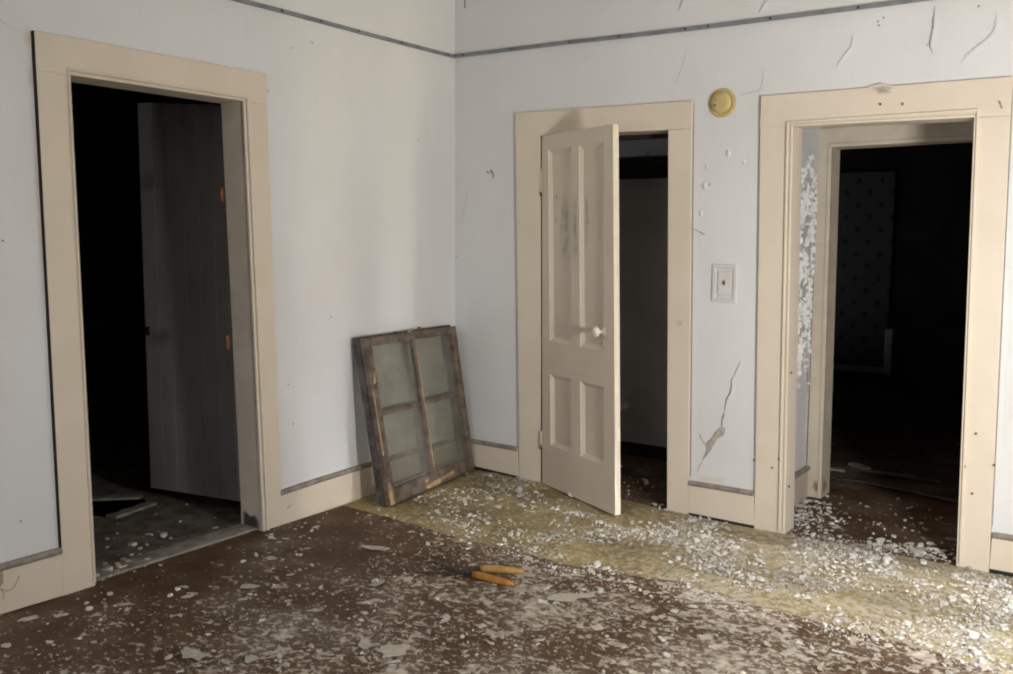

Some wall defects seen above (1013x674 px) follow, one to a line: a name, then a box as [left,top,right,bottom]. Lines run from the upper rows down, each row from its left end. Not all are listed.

crack [926,5,941,53]
crack [697,361,744,472]